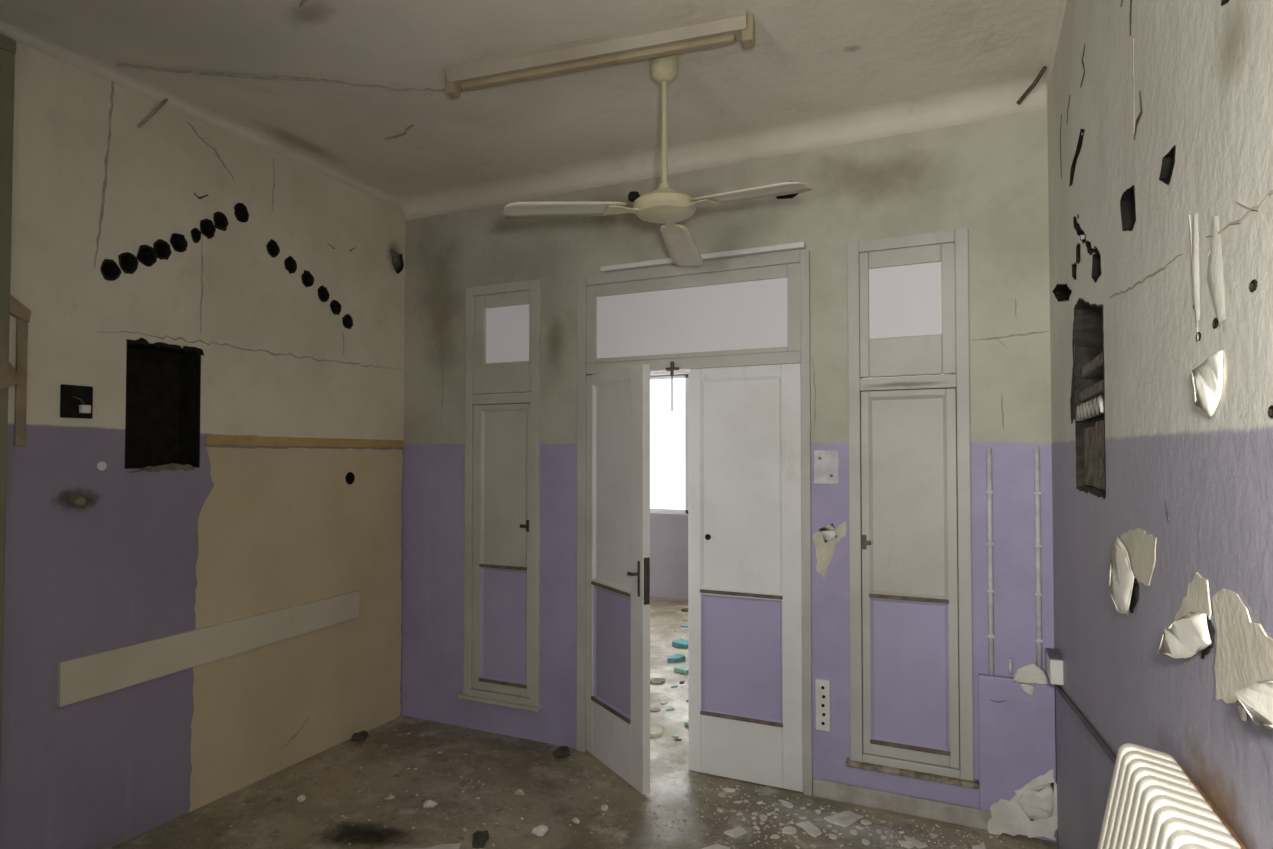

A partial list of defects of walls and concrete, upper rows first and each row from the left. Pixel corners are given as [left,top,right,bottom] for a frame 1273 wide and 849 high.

crack [94,63,463,266]
spalling [1069,128,1085,187]
spalling [1159,145,1176,185]
spalling [1120,185,1136,231]
spalling [1053,215,1101,302]
crack [1110,190,1273,343]
peeling [1192,350,1224,416]
peeling [813,520,847,577]
peeling [1109,528,1157,616]
flaking render [1013,663,1050,696]
peeling [1157,572,1273,730]
spalling [988,769,1058,841]